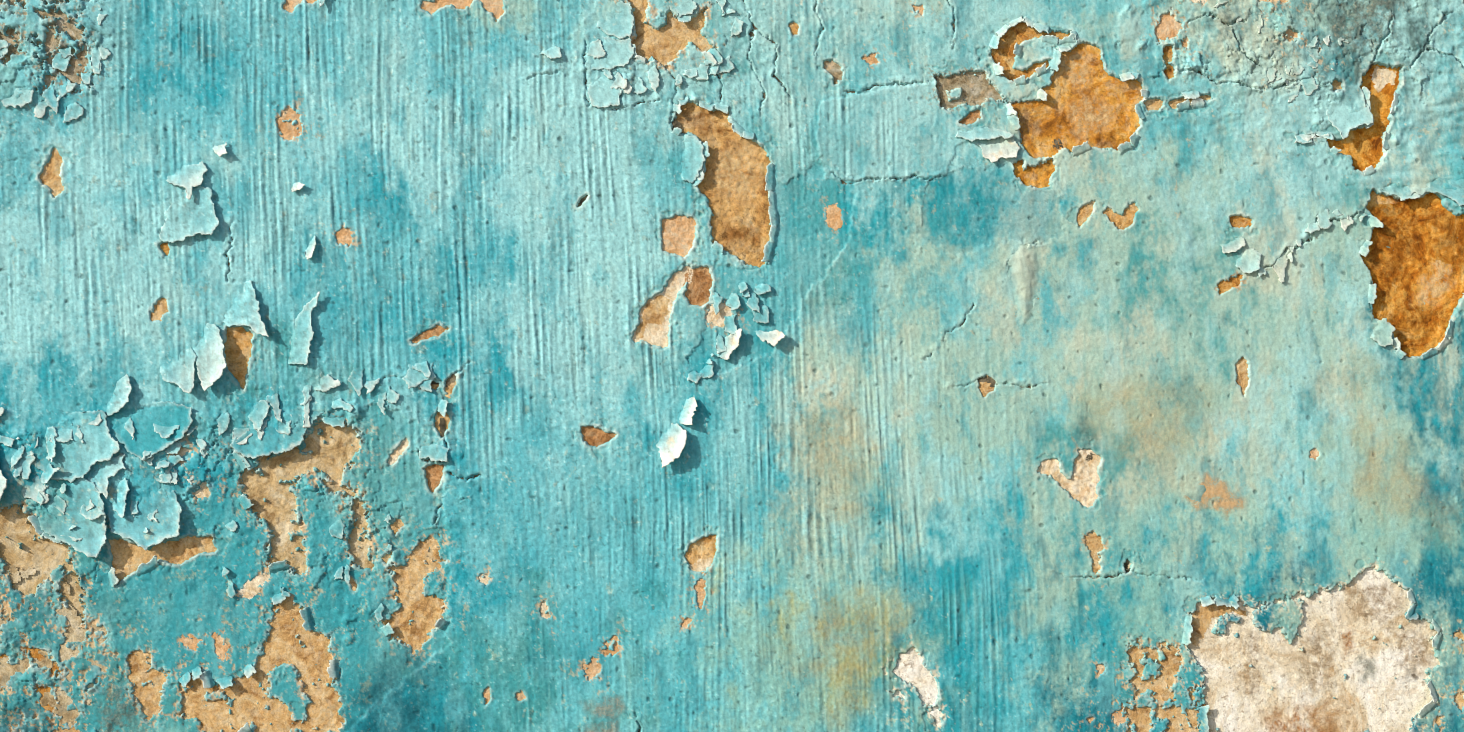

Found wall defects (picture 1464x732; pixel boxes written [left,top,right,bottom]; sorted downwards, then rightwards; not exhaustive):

peeling [0,0,111,123]
peeling [935,12,1211,188]
peeling [585,0,785,468]
peeling [1217,29,1464,361]
peeling [1235,357,1249,395]
peeling [0,280,456,732]
flaking render [1037,449,1101,508]
flaking render [890,648,941,726]
flaking render [1112,566,1464,732]